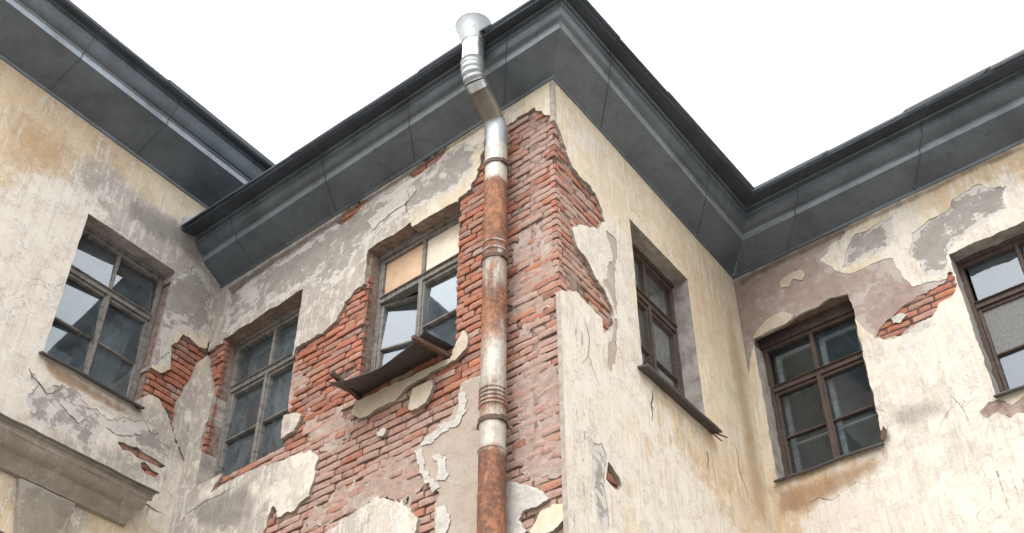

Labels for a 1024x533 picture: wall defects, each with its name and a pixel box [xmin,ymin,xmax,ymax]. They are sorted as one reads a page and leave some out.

flaking render [139,143,485,533]
flaking render [506,112,617,533]
flaking render [733,184,1006,373]